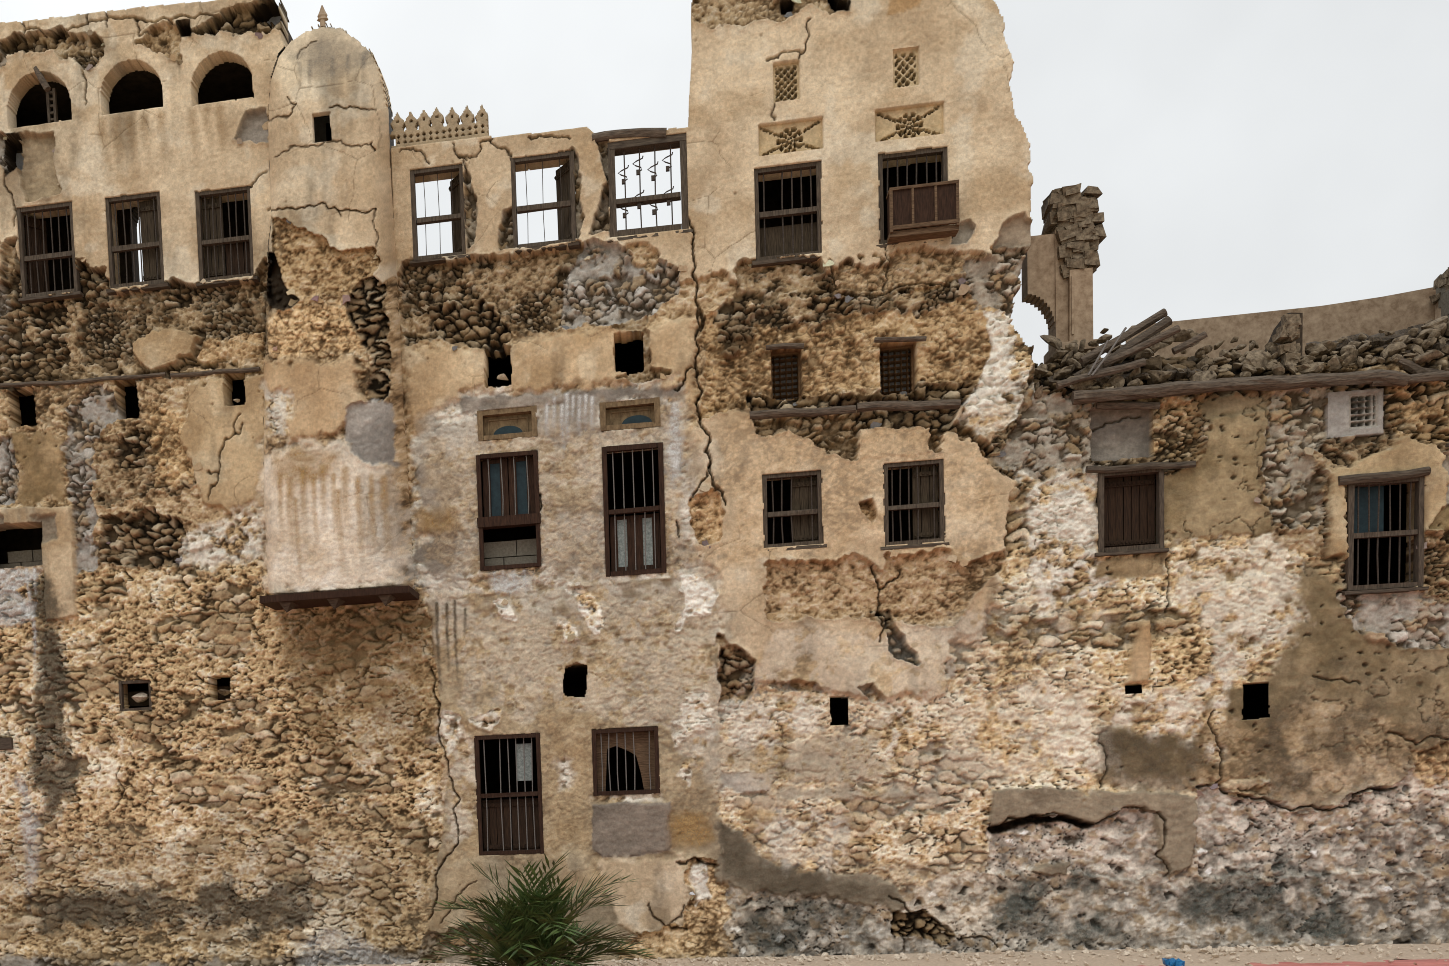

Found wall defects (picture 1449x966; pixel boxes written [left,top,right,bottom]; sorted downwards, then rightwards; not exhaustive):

spalling [691,0,849,29]
crack [766,17,811,62]
spalling [0,133,688,575]
crack [674,220,727,537]
spalling [699,214,1032,461]
crack [207,414,244,498]
spalling [1383,380,1449,505]
crack [870,565,902,643]
spalling [1336,531,1449,649]
spalling [672,634,823,747]
crack [1312,676,1360,684]
crack [428,669,477,924]